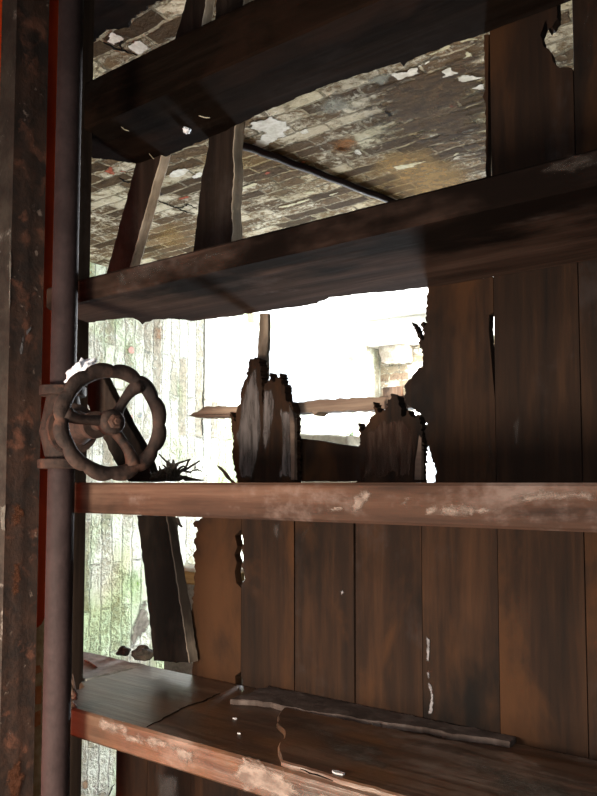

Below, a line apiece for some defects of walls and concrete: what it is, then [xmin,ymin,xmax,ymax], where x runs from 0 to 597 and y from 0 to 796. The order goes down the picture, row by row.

peeling [107,33,148,54]
flaking render [361,38,486,170]
peeling [250,117,308,148]
crack [147,693,220,727]